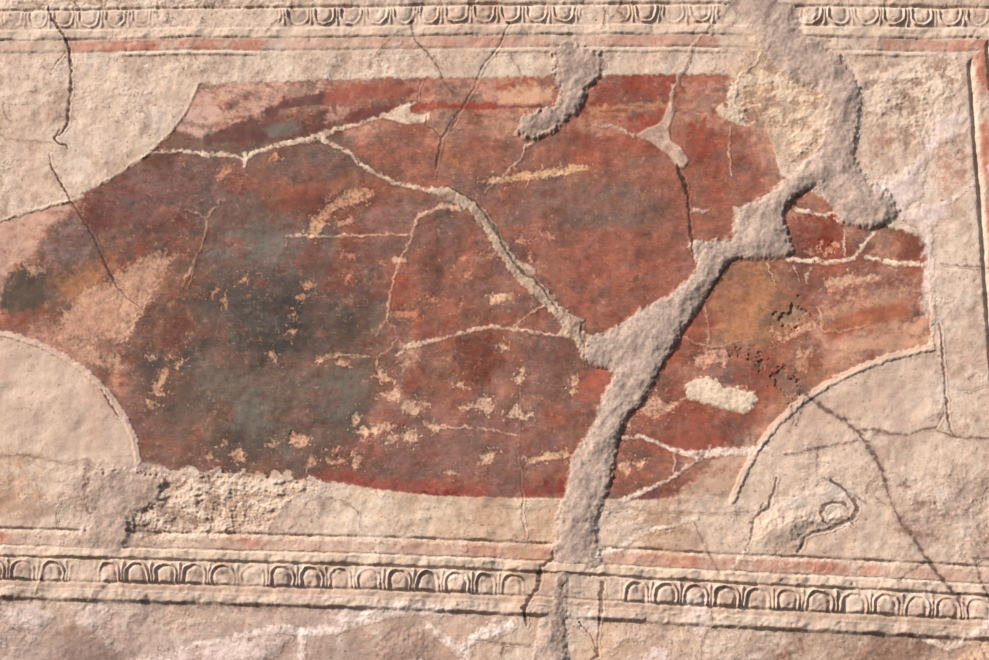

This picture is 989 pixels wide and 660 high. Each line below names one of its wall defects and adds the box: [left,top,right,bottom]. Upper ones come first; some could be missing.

crack [263,0,294,33]
crack [0,0,145,311]
crack [141,10,590,370]
peeling [475,156,597,191]
crack [592,0,738,265]
spalling [715,55,826,168]
crack [940,162,989,208]
spalling [130,287,452,542]
peeling [450,335,540,430]
crack [164,179,989,660]
peeling [625,386,684,431]
flaking render [687,295,819,405]